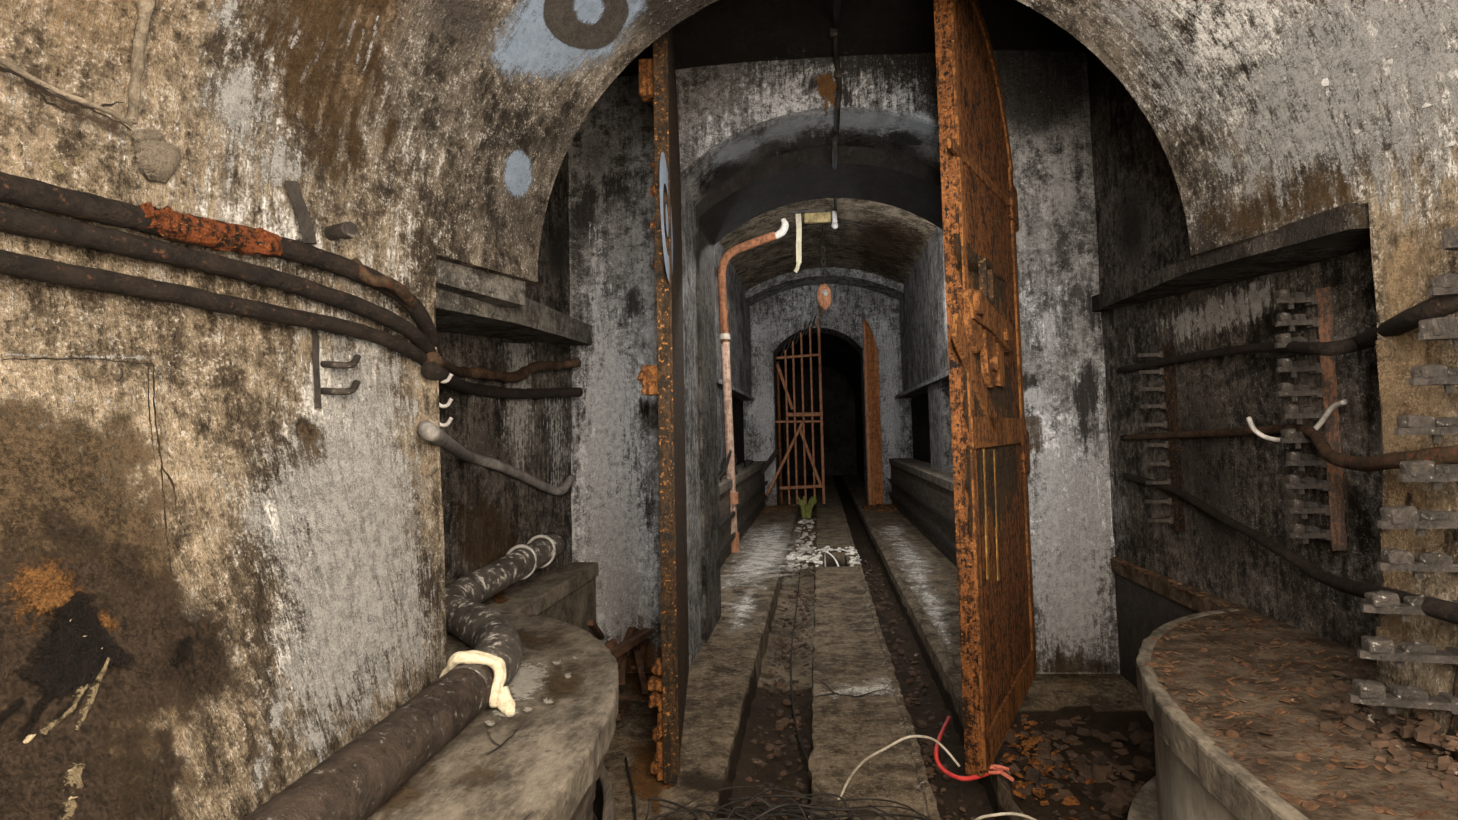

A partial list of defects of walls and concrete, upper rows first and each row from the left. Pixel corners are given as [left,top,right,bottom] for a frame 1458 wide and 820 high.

efflorescence [209,0,241,34]
efflorescence [192,63,313,201]
rust [8,559,83,624]
rust [98,614,119,631]
leakage [0,394,241,820]
leakage [244,334,444,789]
leakage [517,628,589,705]